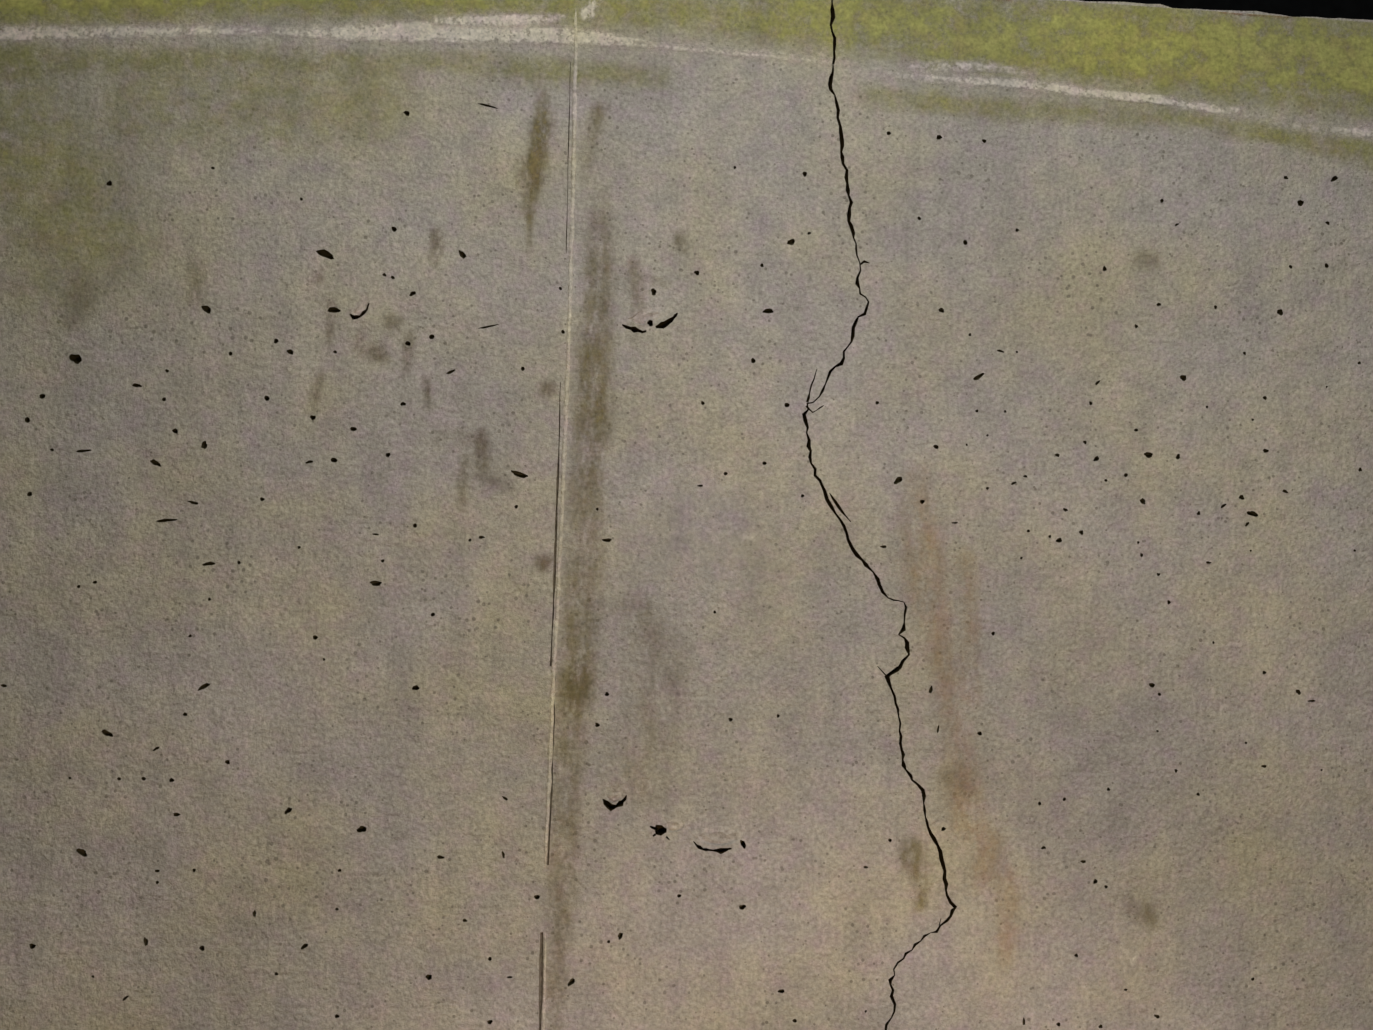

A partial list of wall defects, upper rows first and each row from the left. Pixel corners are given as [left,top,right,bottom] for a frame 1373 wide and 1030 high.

crack [802,0,957,1030]